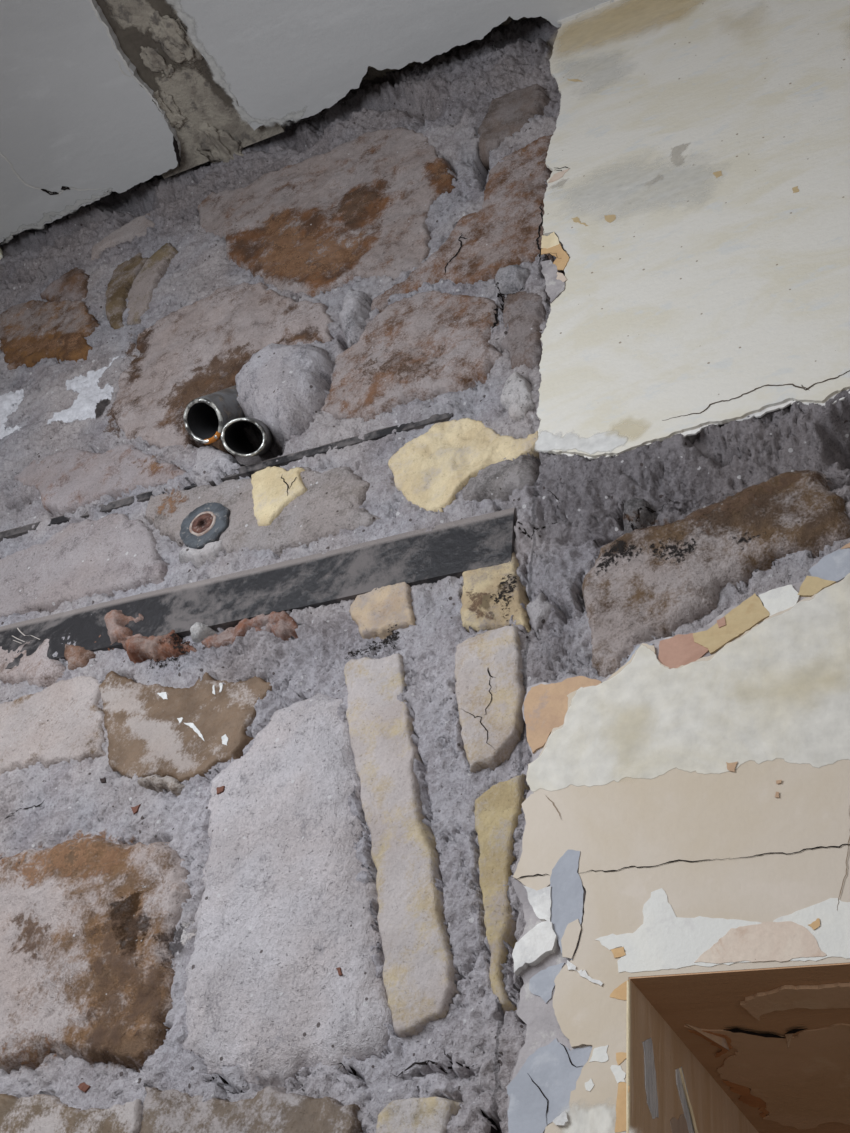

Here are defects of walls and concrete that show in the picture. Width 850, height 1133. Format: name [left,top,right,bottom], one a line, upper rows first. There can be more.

flaking render [0,0,850,699]
crack [662,370,850,421]
flaking render [0,680,47,704]
flaking render [52,576,602,1133]
crack [582,807,850,902]
flaking render [0,722,264,1111]
peeling [611,947,626,958]
peeling [610,980,629,1000]
peeling [740,982,850,1021]
peeling [684,1023,850,1129]
peeling [615,1082,630,1133]